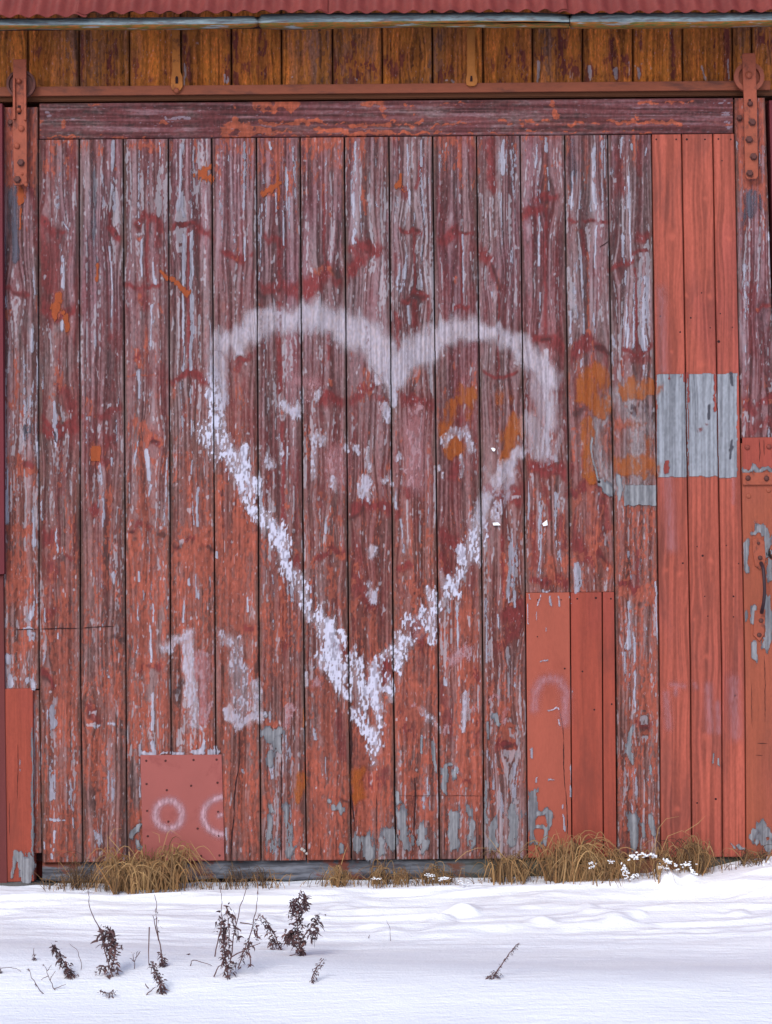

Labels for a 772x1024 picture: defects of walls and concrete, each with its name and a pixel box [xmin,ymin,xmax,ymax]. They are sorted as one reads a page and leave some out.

peeling [498,139,517,228]
peeling [568,139,613,212]
peeling [176,143,195,435]
peeling [612,175,649,366]
peeling [134,441,152,497]
peeling [507,481,582,624]
peeling [622,601,636,708]
peeling [743,523,772,663]
peeling [11,728,74,884]
peeling [139,692,220,764]
peeling [339,735,571,863]
peeling [624,724,656,852]